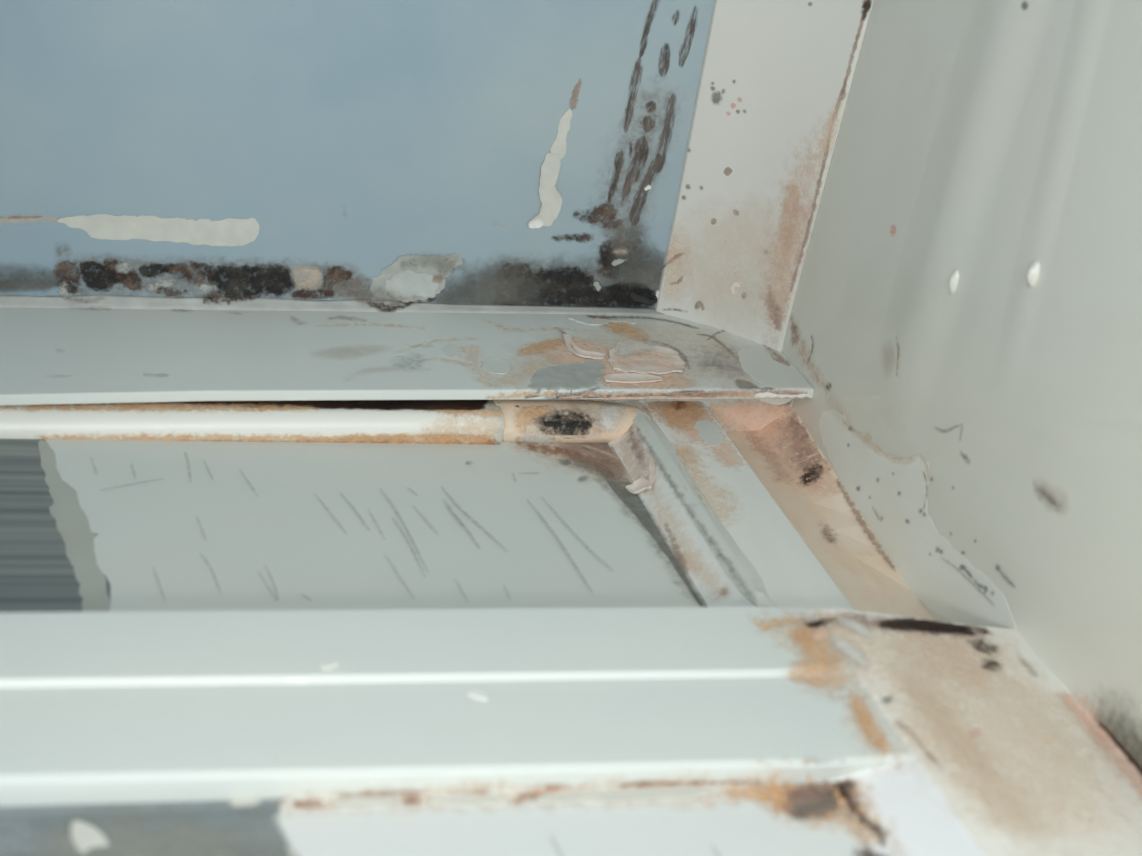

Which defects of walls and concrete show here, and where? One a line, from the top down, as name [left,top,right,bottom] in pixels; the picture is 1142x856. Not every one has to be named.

leakage [659,9,696,76]
peeling [528,80,581,228]
leakage [444,0,674,341]
peeling [57,214,260,247]
leakage [0,260,330,304]
peeling [369,253,463,312]
rust [42,423,500,445]
leakage [4,391,592,435]
rust [649,401,740,517]
rust [758,615,861,688]
rust [618,782,787,803]
peeling [71,820,109,854]